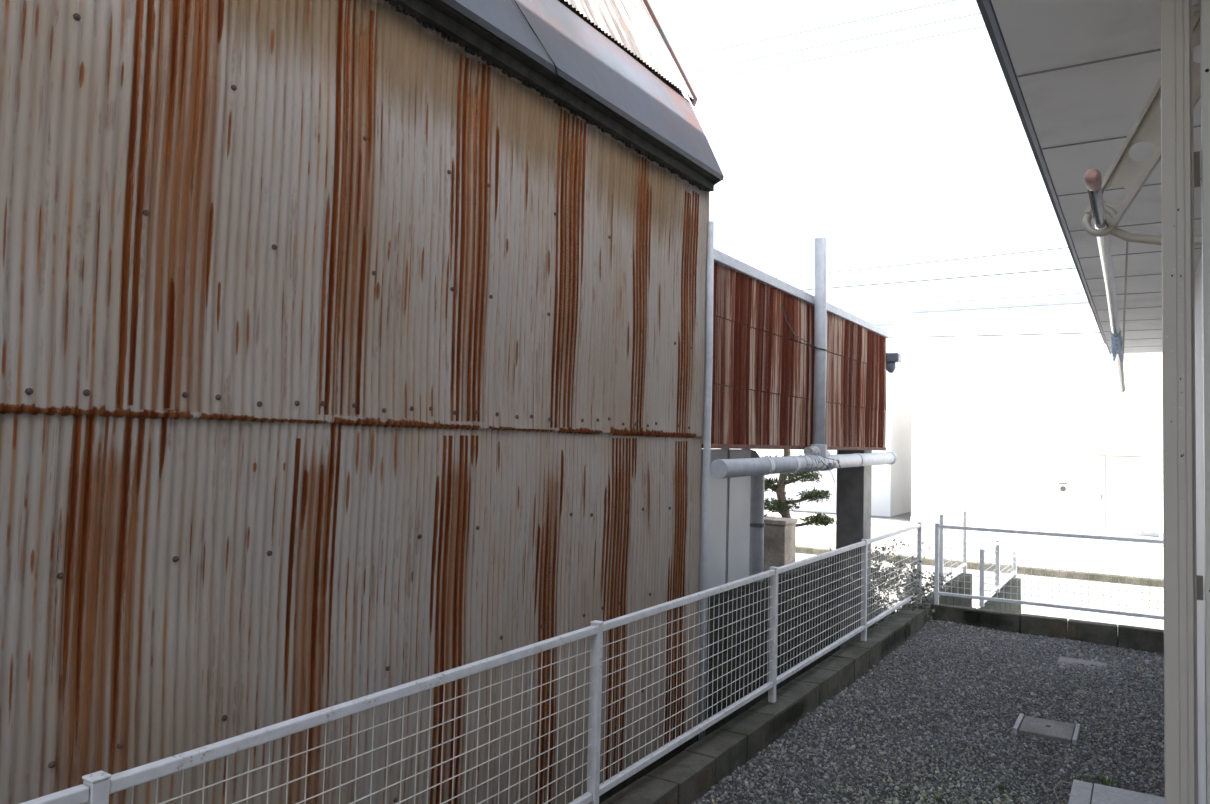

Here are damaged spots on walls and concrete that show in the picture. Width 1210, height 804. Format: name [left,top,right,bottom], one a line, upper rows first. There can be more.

corrosion [0,0,717,804]
corrosion [733,272,814,446]
corrosion [843,320,887,447]